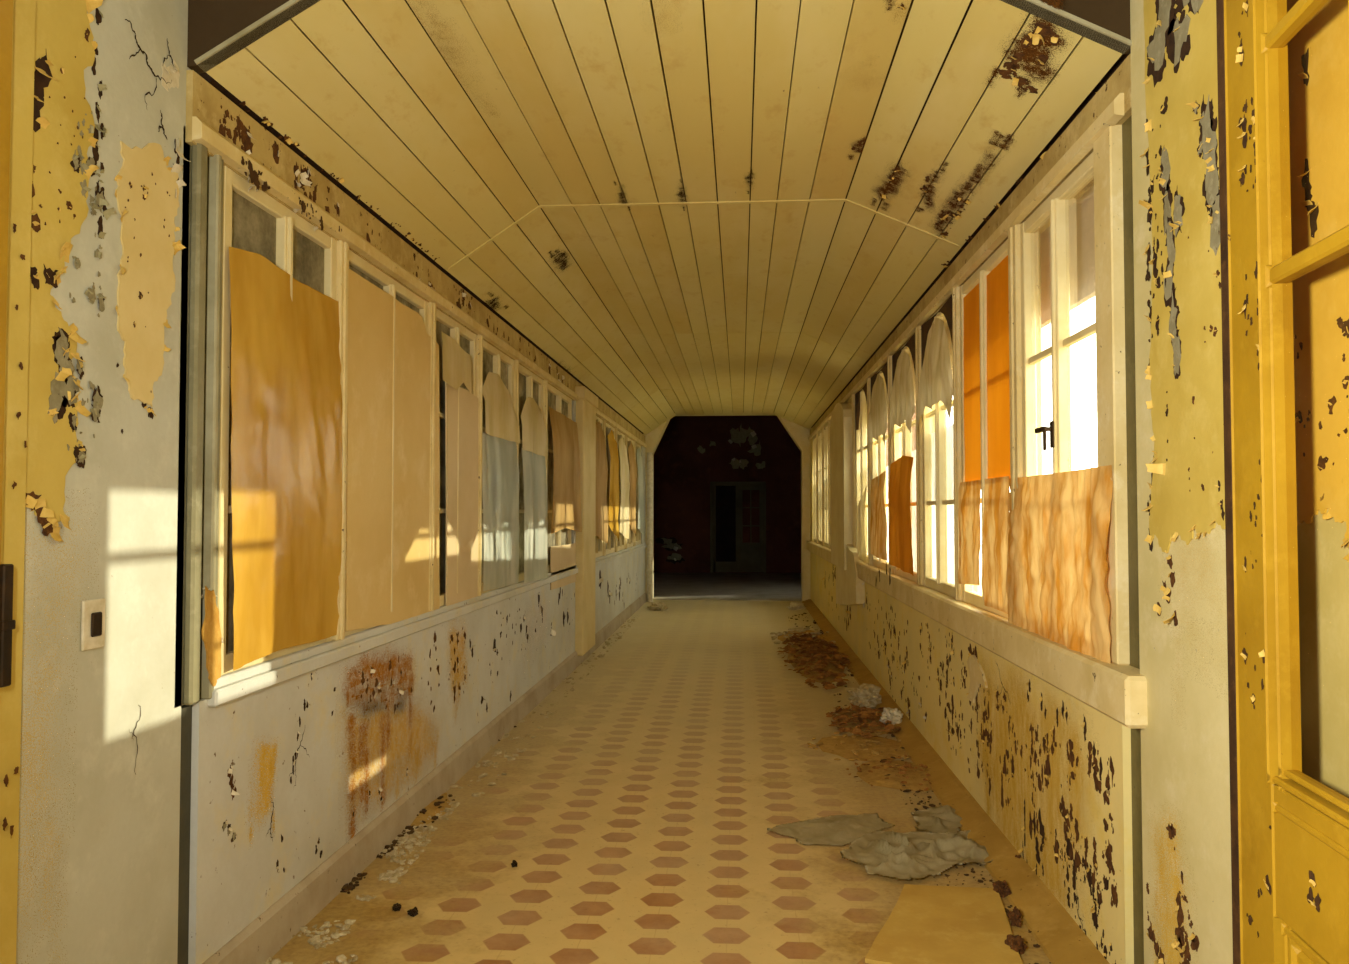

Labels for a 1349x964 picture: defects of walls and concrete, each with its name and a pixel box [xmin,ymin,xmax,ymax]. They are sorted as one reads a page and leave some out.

peeling [999,21,1060,94]
peeling [1235,32,1244,66]
peeling [12,0,191,542]
peeling [218,101,344,232]
peeling [356,195,440,291]
peeling [935,196,972,238]
peeling [1138,0,1225,626]
peeling [1237,97,1256,192]
peeling [1238,261,1259,370]
peeling [1240,648,1265,709]
rust [338,644,416,840]
peeling [866,597,1118,964]